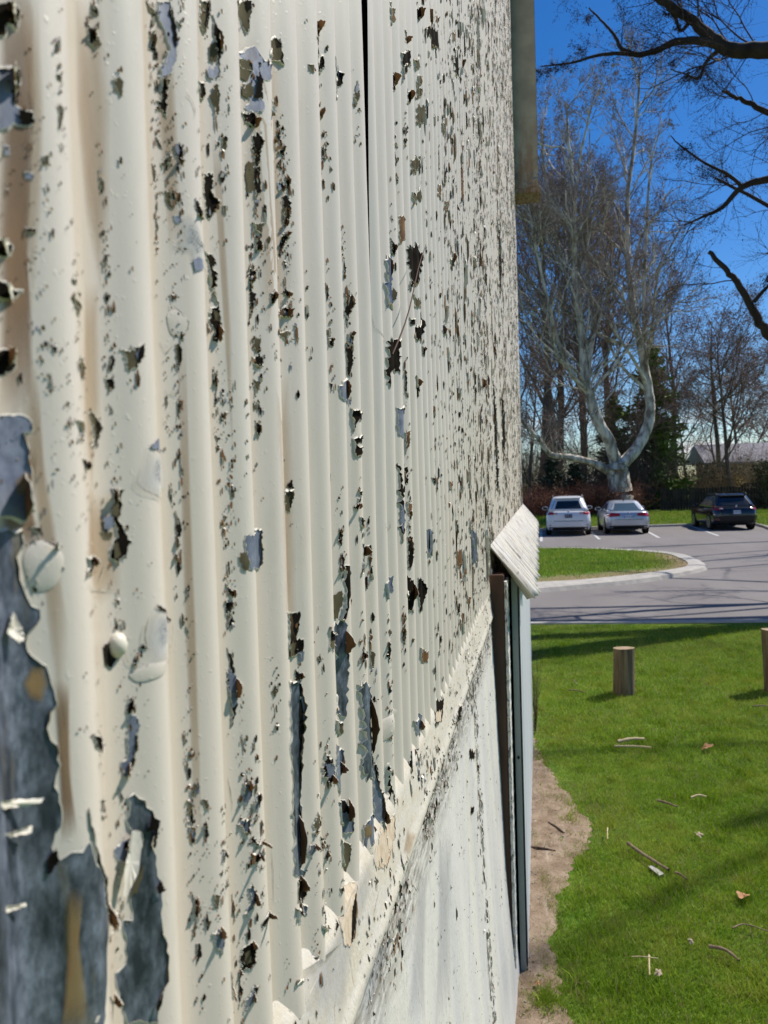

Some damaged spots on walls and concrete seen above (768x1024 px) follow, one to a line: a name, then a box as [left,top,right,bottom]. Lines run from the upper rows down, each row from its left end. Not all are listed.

peeling [146,0,183,119]
peeling [198,0,287,199]
peeling [383,215,427,357]
peeling [240,527,264,571]
peeling [0,406,170,1024]
peeling [271,528,407,948]